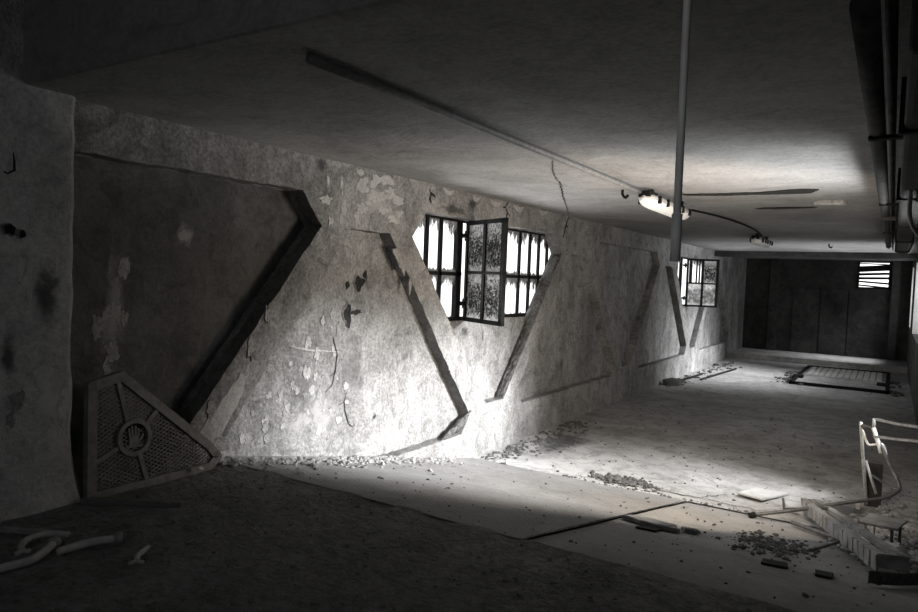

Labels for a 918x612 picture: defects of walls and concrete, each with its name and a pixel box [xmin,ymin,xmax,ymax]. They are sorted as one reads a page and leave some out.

peeling [318,169,404,228]
crack [552,160,571,237]
spalling [320,270,367,334]
peeling [179,374,250,459]
peeling [250,336,342,444]